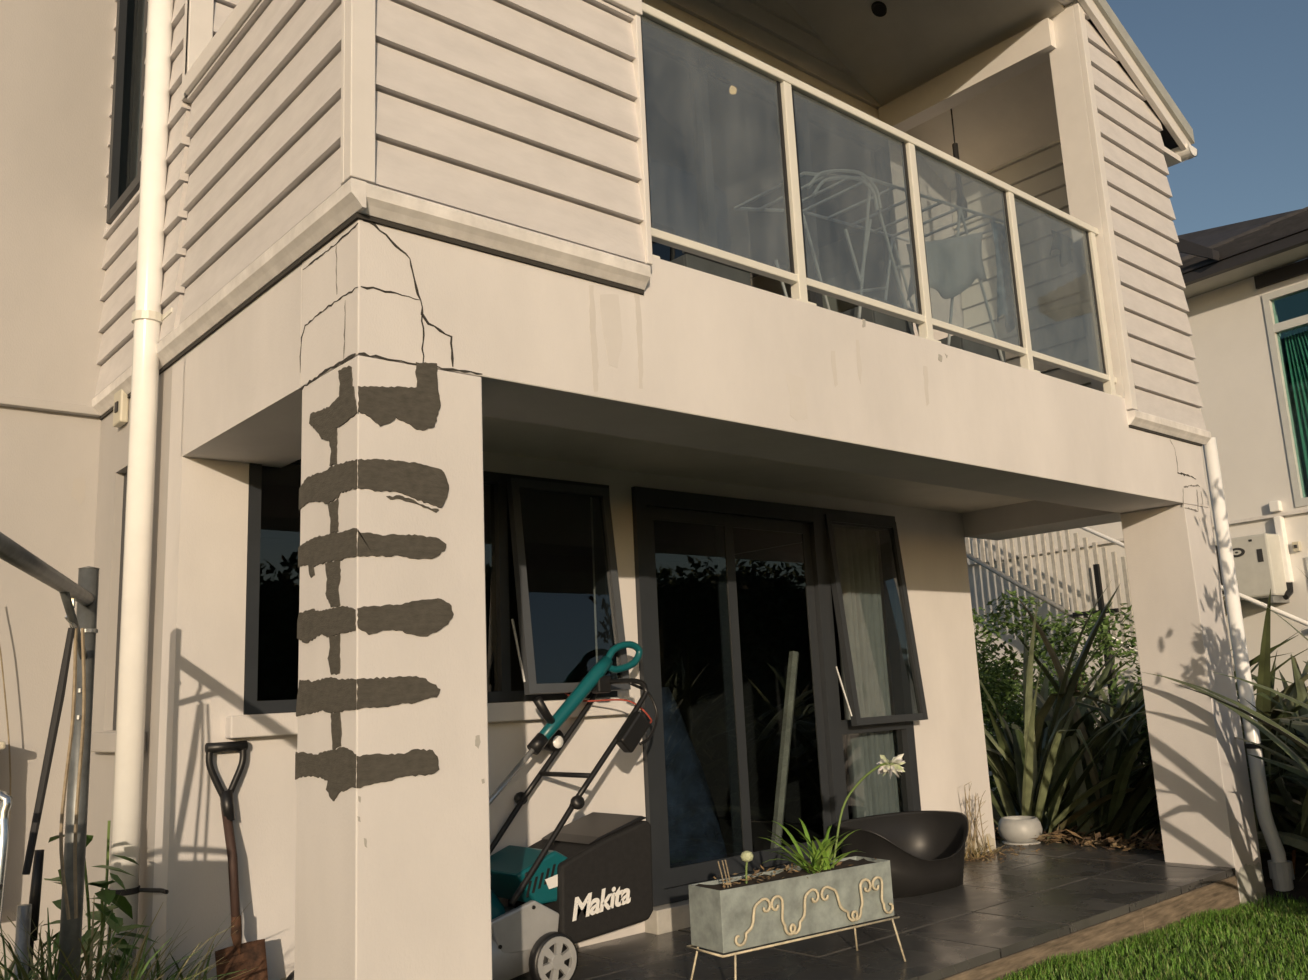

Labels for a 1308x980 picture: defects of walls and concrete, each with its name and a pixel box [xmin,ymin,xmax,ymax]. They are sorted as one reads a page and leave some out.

crack [299,220,482,390]
crack [1170,440,1203,512]